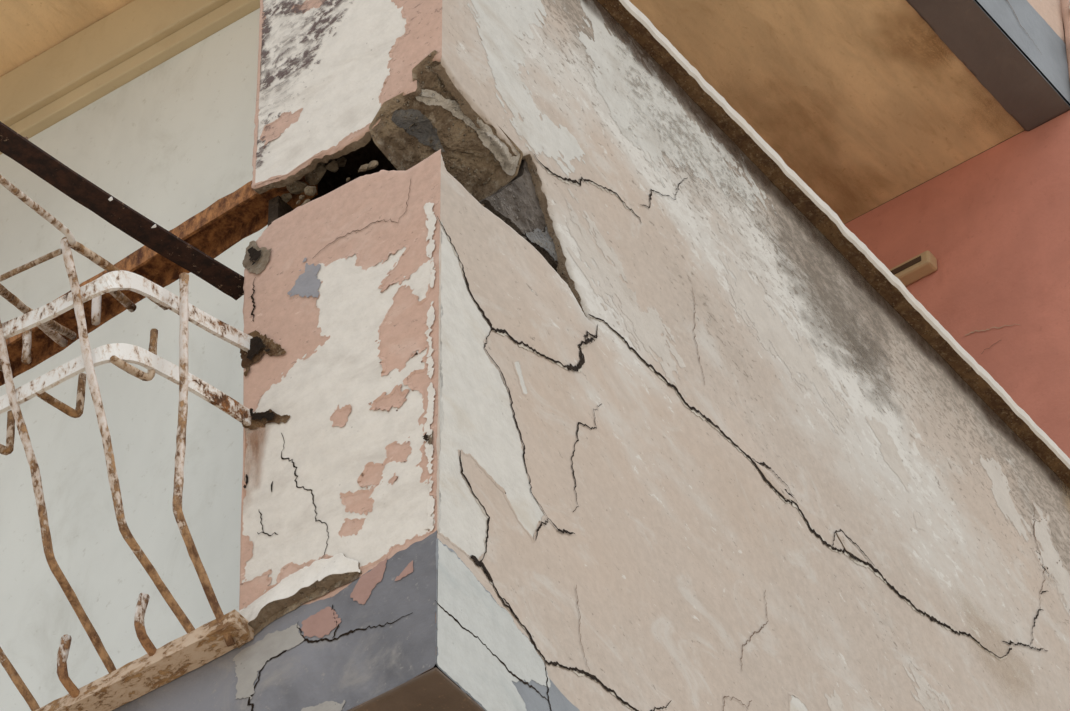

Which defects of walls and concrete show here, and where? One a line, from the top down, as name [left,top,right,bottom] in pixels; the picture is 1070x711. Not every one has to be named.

peeling [254,0,687,398]
crack [534,154,687,225]
crack [243,433,329,559]
peeling [233,202,551,711]
crack [247,451,671,711]
crack [437,216,1049,665]